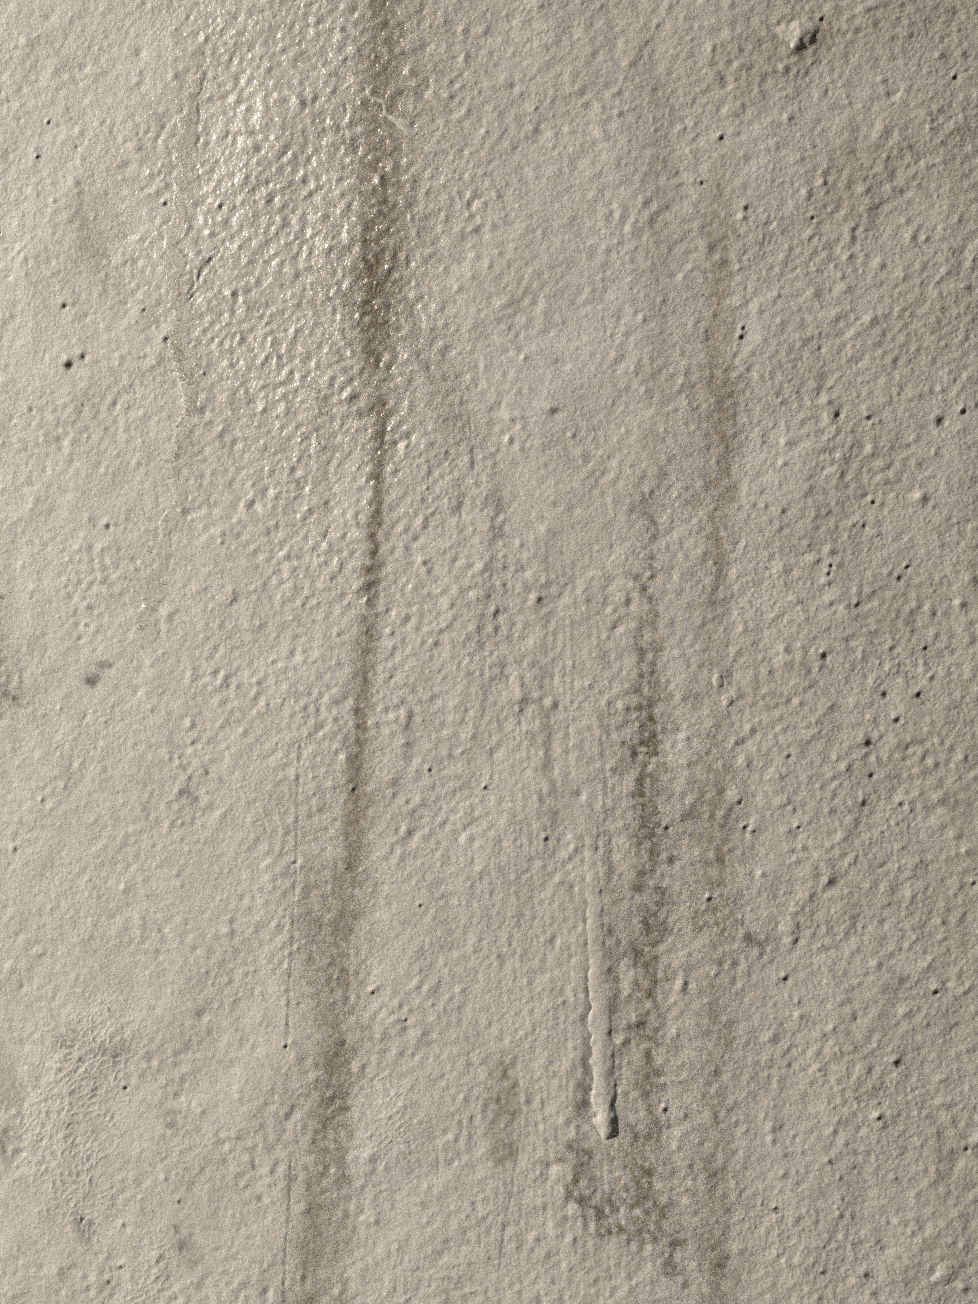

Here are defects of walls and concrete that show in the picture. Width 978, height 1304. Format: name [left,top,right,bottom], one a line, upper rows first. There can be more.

leakage [634,775,656,856]